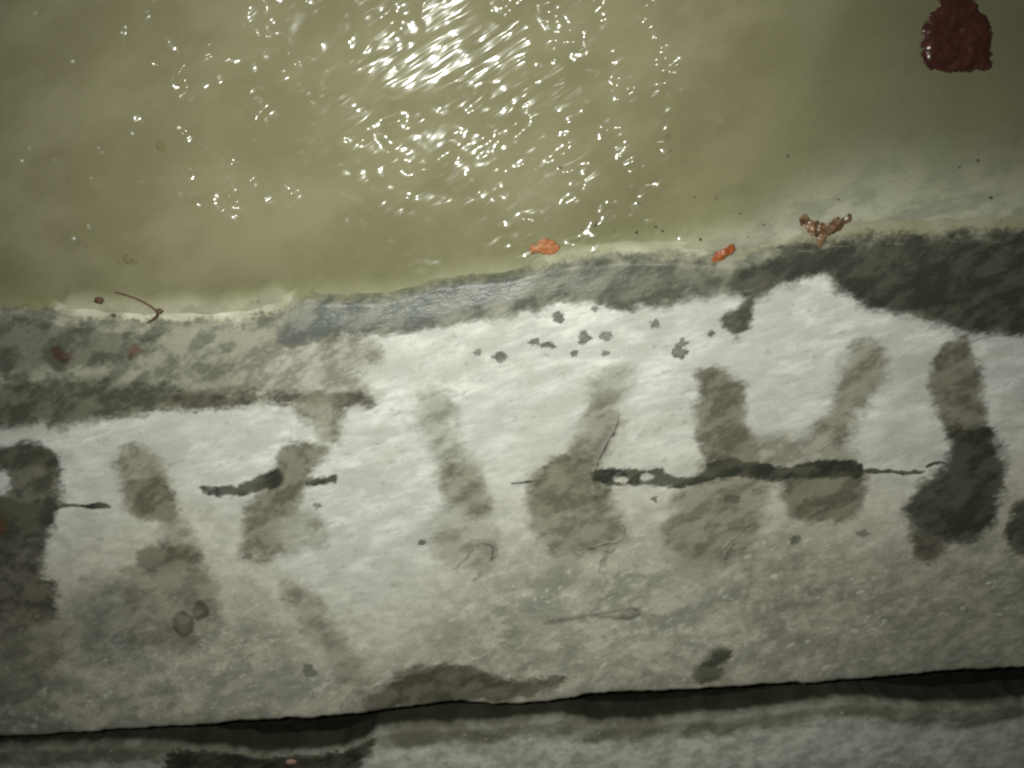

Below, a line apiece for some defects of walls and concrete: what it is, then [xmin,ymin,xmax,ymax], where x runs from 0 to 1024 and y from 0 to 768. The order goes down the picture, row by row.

water stain [0,229,1024,560]
crack [200,469,337,497]
crack [592,457,945,489]
water stain [0,440,67,702]
water stain [127,530,217,649]